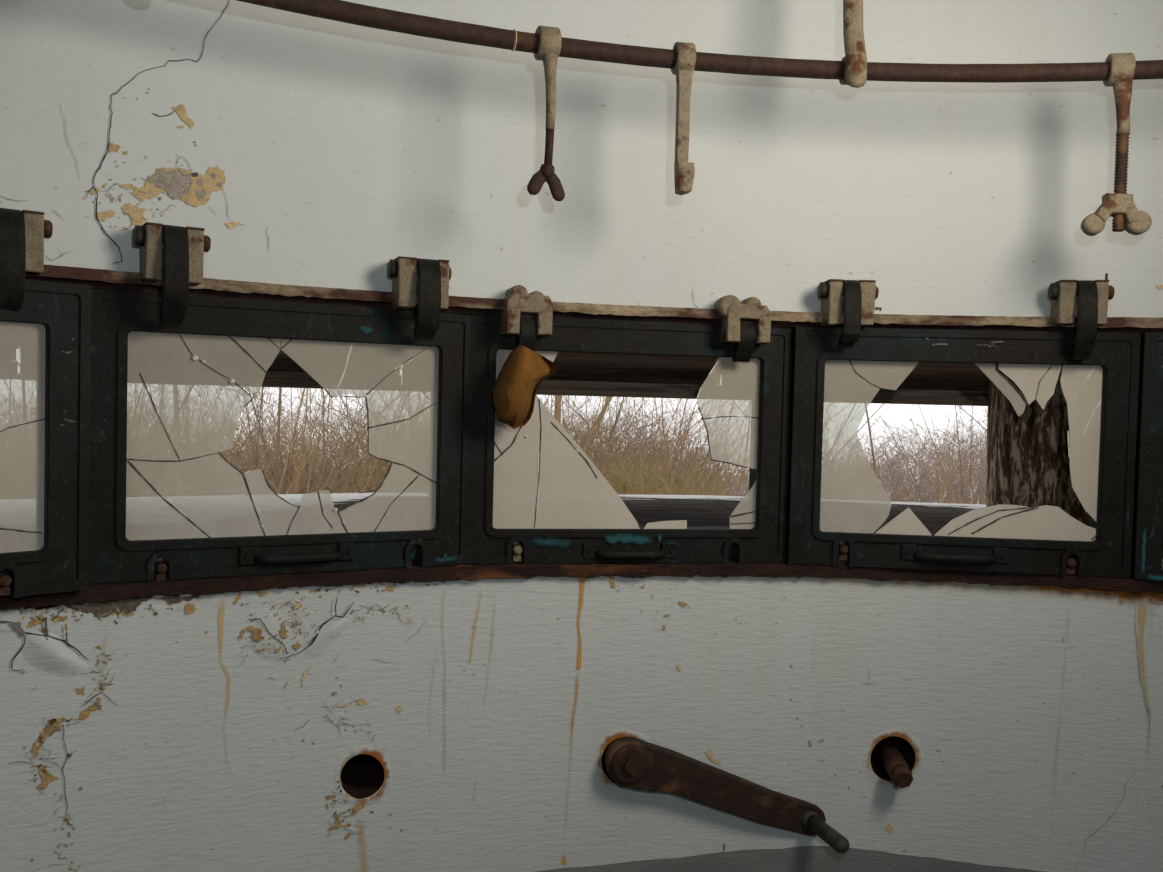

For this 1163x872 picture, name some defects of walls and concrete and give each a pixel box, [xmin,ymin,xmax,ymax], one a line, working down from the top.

crack [60,3,229,264]
peeling [173,104,197,146]
peeling [83,143,225,230]
crack [249,596,354,688]
peeling [233,582,408,665]
corrosion [576,577,586,669]
corrosion [932,530,1163,673]
crack [0,614,118,829]
peeling [24,645,115,871]
corrosion [362,751,389,801]